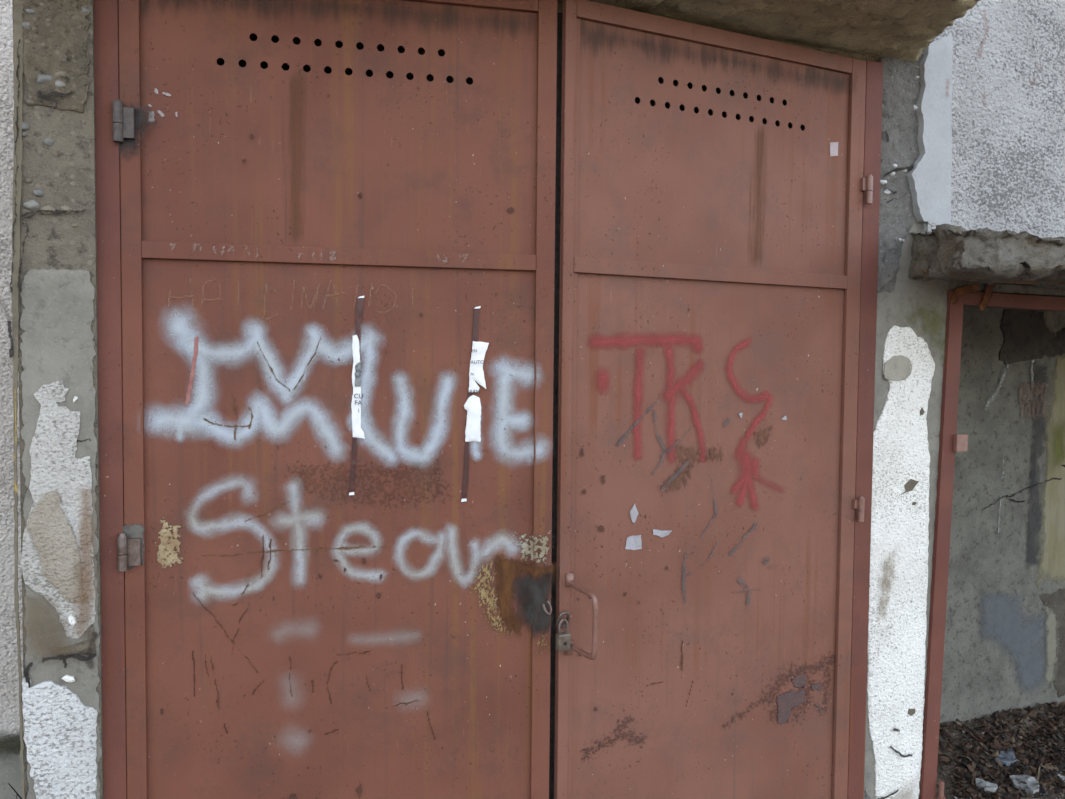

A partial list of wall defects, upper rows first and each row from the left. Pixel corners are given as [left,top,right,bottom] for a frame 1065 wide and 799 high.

spalling [877,52,924,293]
flaking render [20,380,99,669]
rust [467,530,554,655]
flaking render [864,326,935,799]
flaking render [22,675,98,799]